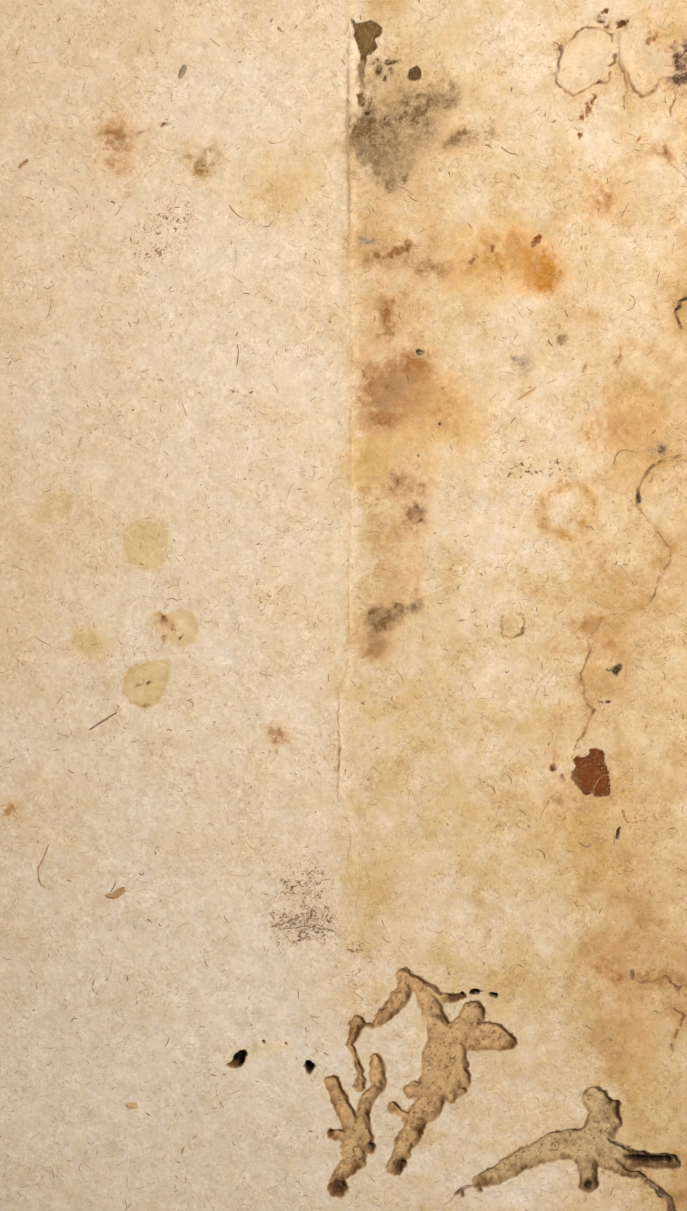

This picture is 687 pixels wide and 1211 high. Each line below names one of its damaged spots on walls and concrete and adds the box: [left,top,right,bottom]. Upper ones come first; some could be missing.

damp [342,63,495,193]
rust [451,227,565,295]
damp [357,237,468,443]
crack [674,297,687,329]
damp [350,447,426,538]
crack [636,454,681,506]
crack [574,632,595,748]
rust [546,748,611,813]
spalling [330,1179,344,1194]
spalling [624,1153,672,1162]